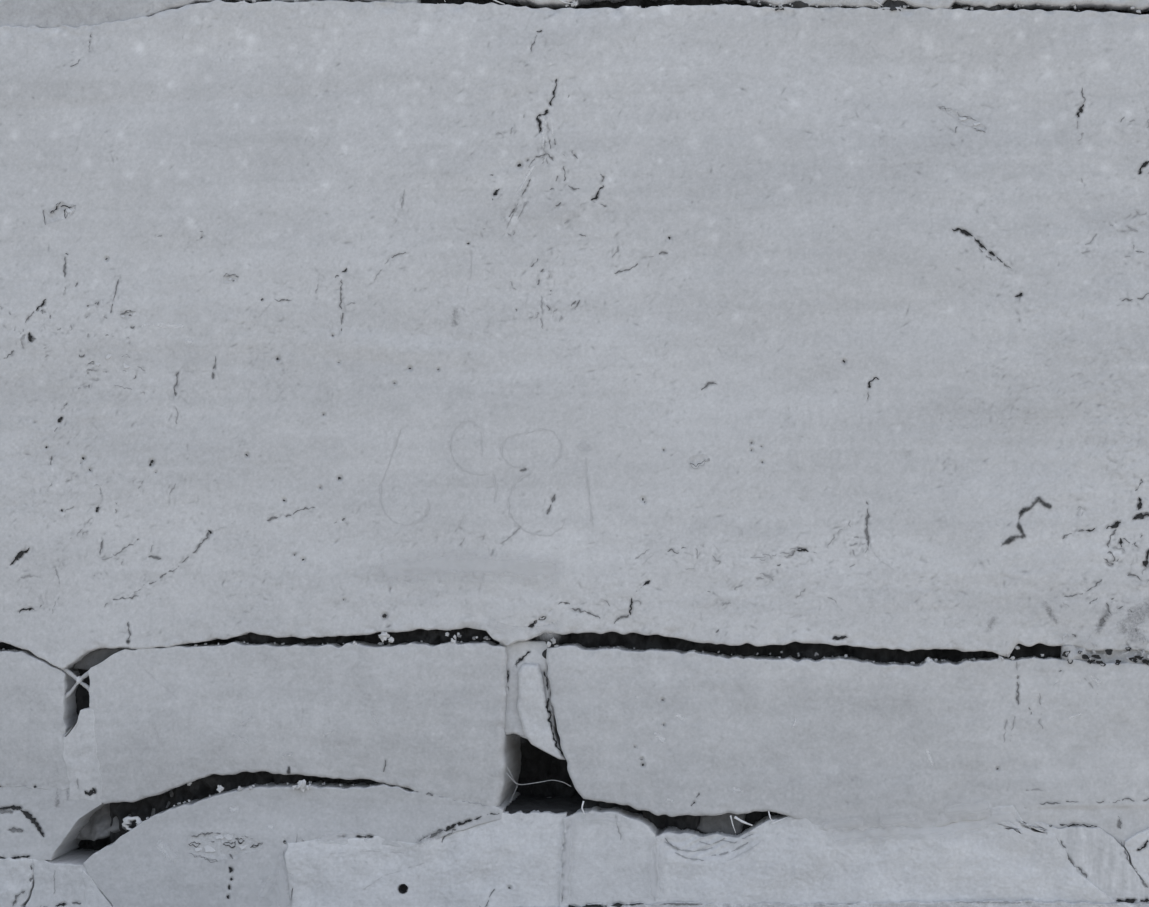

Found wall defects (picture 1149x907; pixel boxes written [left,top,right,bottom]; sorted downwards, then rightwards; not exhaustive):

crack [496,79,606,236]
crack [952,228,1011,268]
crack [507,501,894,755]
crack [1003,661,1043,743]
crack [331,791,499,890]
crack [1026,789,1149,878]
crack [1116,840,1149,903]